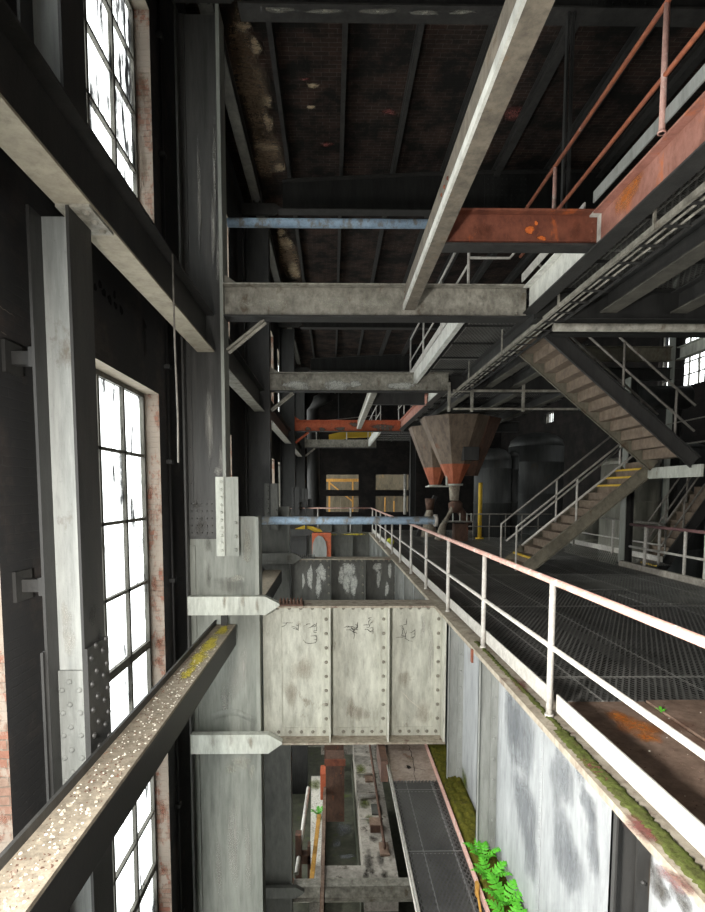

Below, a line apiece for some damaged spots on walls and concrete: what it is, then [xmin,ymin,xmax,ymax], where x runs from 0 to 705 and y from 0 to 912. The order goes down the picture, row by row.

water stain [302,563,326,597]
water stain [338,563,358,596]
water stain [373,563,392,596]